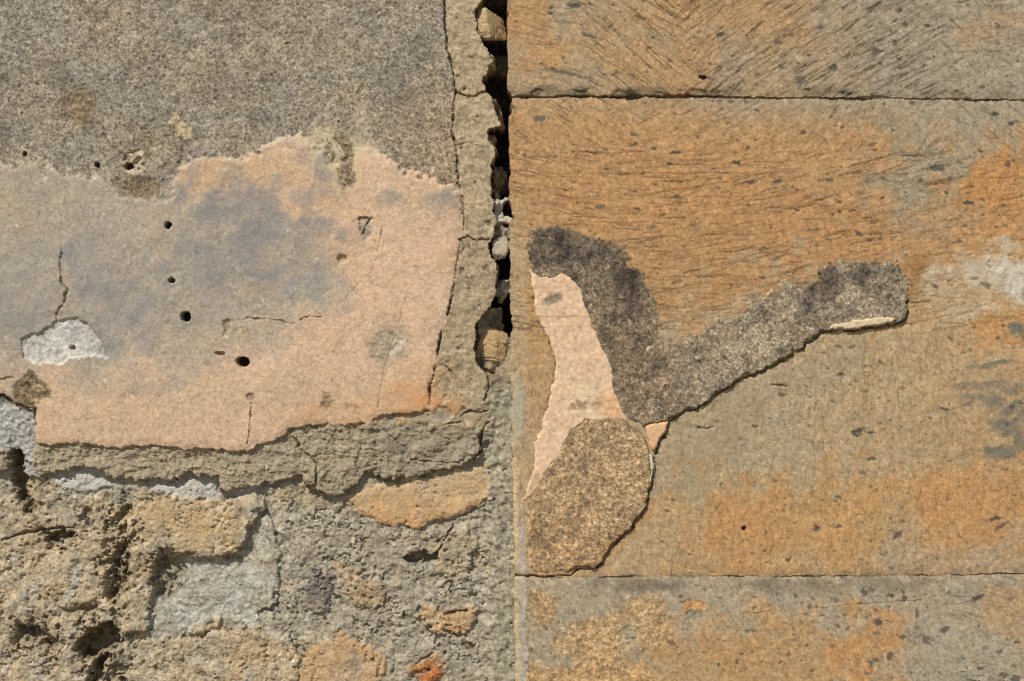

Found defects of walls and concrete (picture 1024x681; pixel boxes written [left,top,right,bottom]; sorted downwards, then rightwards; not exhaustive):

crack [443,0,486,198]
spalling [116,149,163,201]
spalling [324,132,357,190]
crack [231,225,384,325]
spalling [0,336,119,514]
spalling [363,326,411,377]
flaking render [522,223,909,573]
hole [18,619,58,652]
hole [46,528,75,545]
hole [64,544,132,681]
spalling [146,511,283,640]
spalling [146,472,287,501]